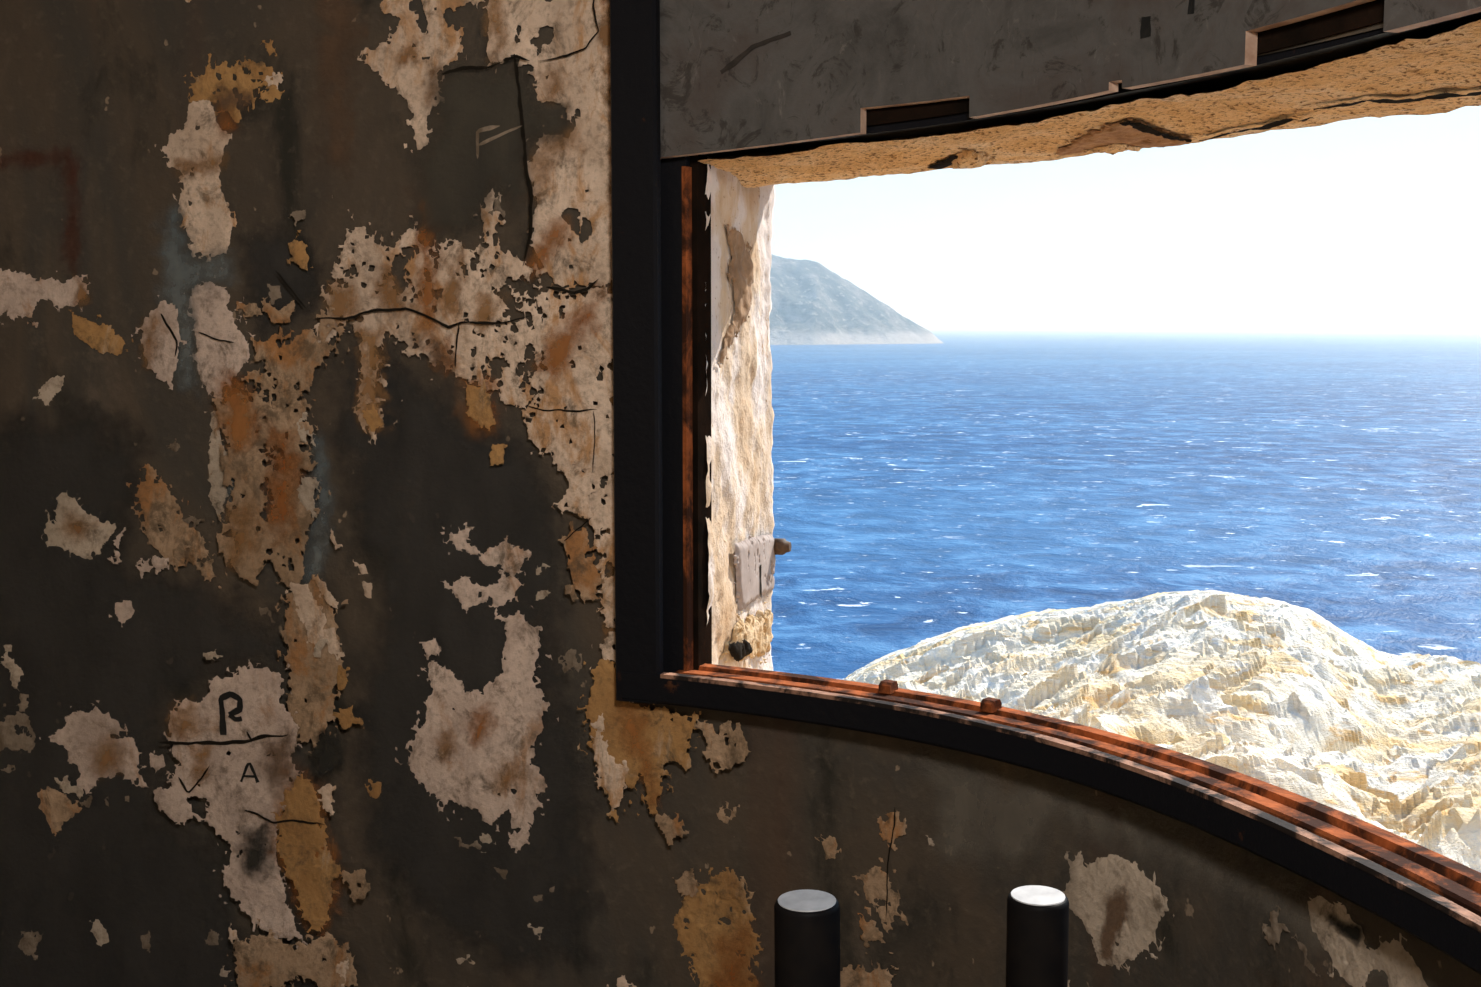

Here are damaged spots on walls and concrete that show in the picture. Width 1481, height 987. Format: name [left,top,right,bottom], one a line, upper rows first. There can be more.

crack [276,0,599,368]
peeling [0,0,764,987]
peeling [1063,851,1174,972]
peeling [1262,895,1428,987]